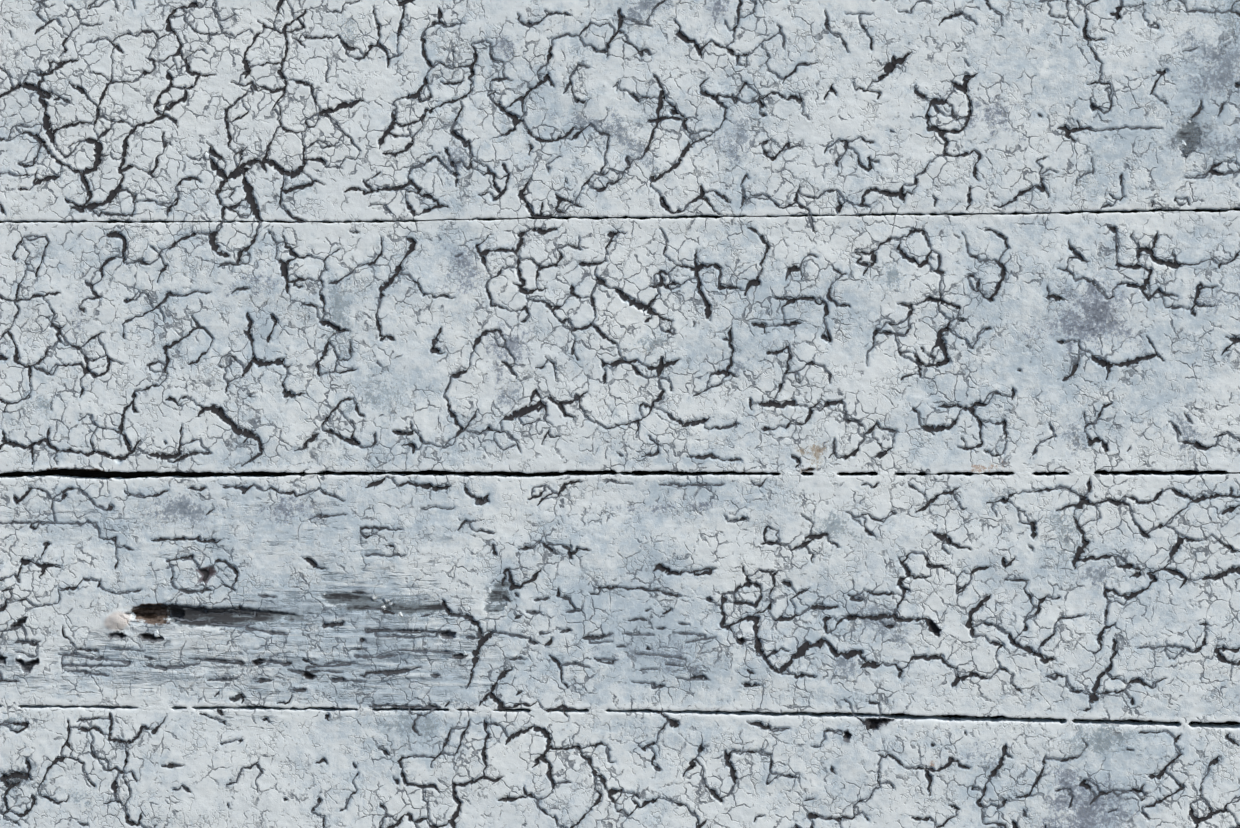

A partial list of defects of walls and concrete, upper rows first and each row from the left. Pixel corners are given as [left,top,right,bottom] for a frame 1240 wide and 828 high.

crack [1038,0,1240,142]
crack [993,156,1094,208]
crack [0,0,1021,466]
crack [1046,161,1240,317]
crack [1222,336,1240,355]
crack [1057,336,1163,452]
crack [1168,412,1240,452]
crack [659,453,766,488]
peeling [108,603,309,643]
peeling [322,593,445,617]
spalling [439,630,468,660]
crack [0,476,1240,828]